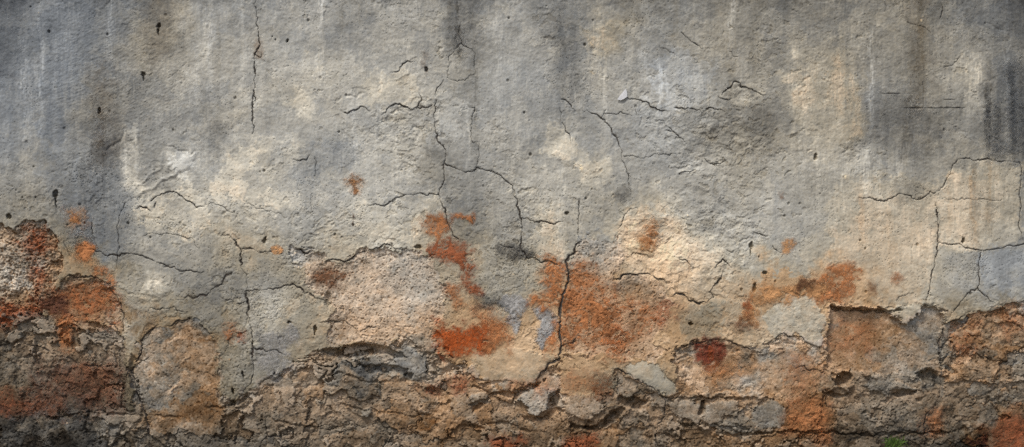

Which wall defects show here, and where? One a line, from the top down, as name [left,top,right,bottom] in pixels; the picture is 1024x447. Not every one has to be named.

crack [560,56,762,179]
rust [0,241,120,346]
spalling [0,220,124,334]
crack [0,191,398,447]
spalling [131,318,281,441]
crack [344,24,580,379]
rust [425,213,513,358]
rust [527,254,673,362]
crack [616,253,728,304]
peeling [469,81,1024,435]
rust [736,263,863,330]
crack [860,158,1022,447]